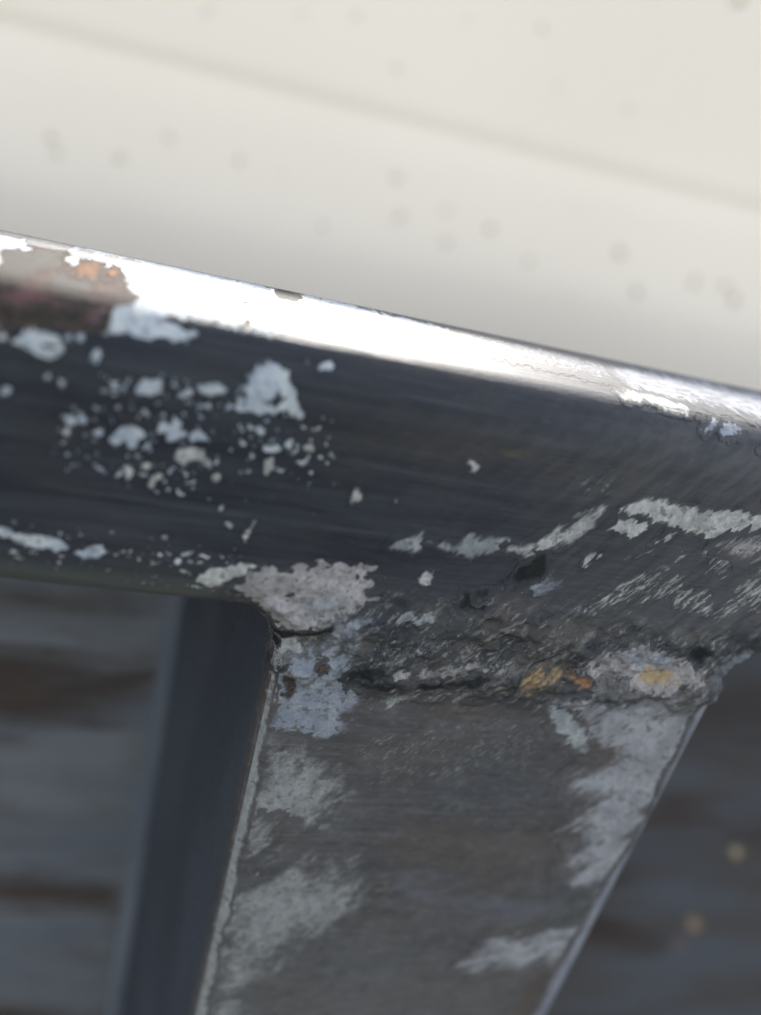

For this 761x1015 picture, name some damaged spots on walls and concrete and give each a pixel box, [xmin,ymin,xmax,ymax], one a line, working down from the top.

corrosion [0,244,144,335]
peeling [0,230,761,446]
peeling [55,355,337,491]
peeling [0,522,114,562]
peeling [346,482,370,509]
corrosion [0,578,167,769]
corrosion [509,654,596,700]
peeling [155,493,761,1015]